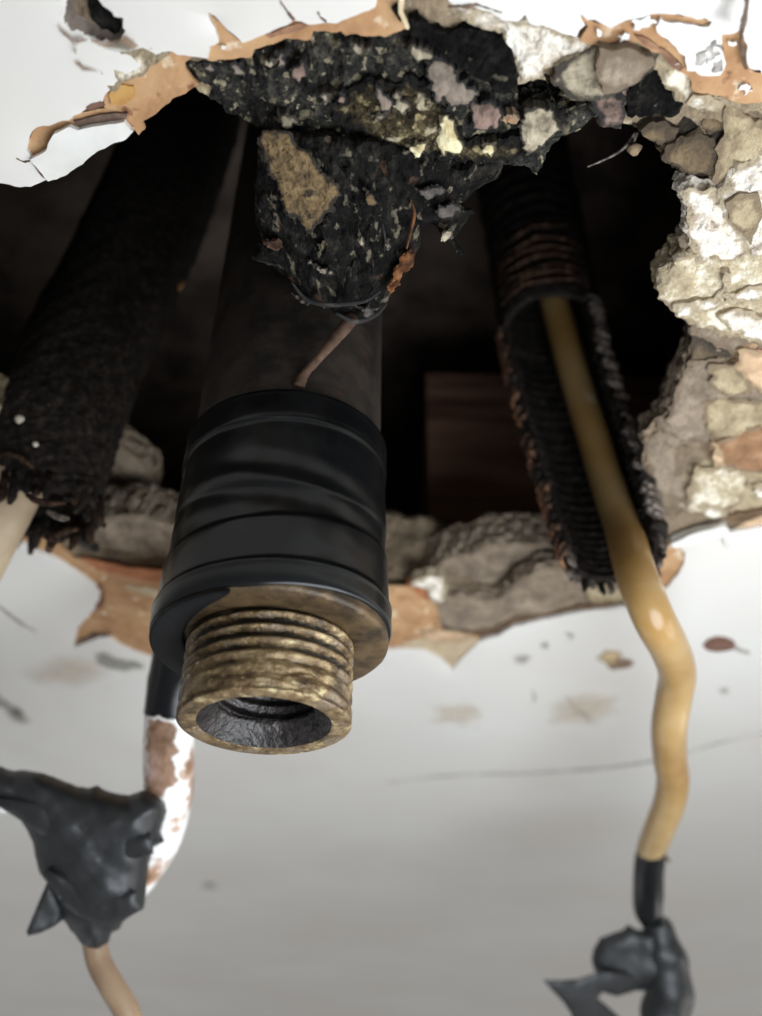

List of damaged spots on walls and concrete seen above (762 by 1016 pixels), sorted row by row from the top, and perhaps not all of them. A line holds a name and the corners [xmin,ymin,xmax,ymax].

spalling [0,373,10,410]
spalling [28,0,762,586]
spalling [38,424,179,655]
spalling [385,510,625,668]